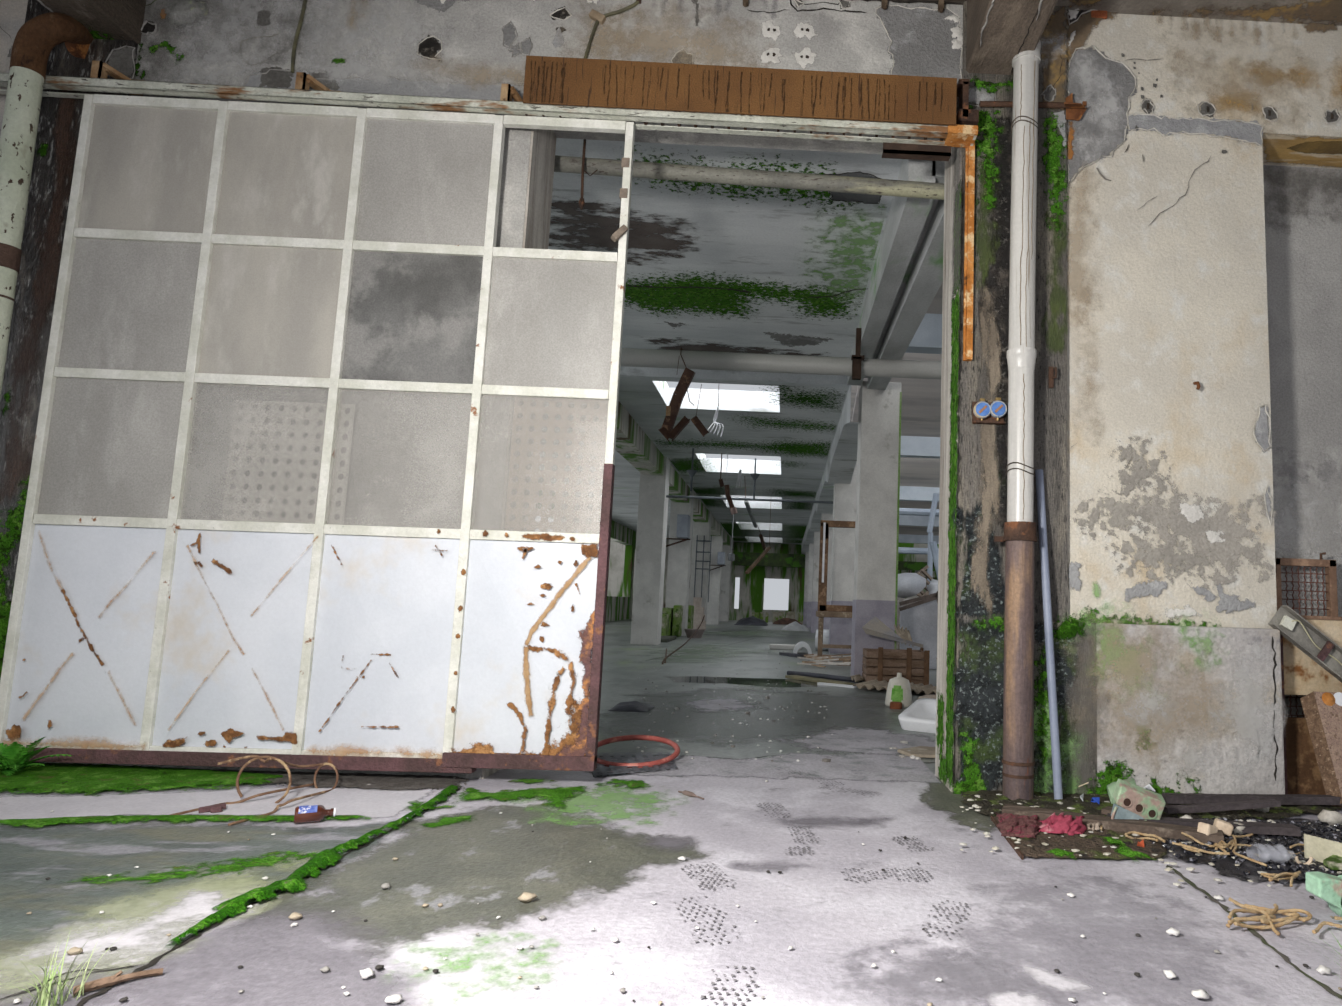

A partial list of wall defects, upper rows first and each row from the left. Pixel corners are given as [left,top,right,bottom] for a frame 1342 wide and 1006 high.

water stain [473,61,566,103]
spalling [1040,8,1278,186]
crack [1139,156,1211,225]
water stain [587,0,1117,832]
spalling [1253,404,1271,452]
rust [3,580,110,746]
rust [187,533,232,578]
rust [163,678,381,756]
rust [400,463,615,759]
spalling [1068,562,1082,591]
water stain [1034,621,1279,794]
spalling [1073,437,1276,664]